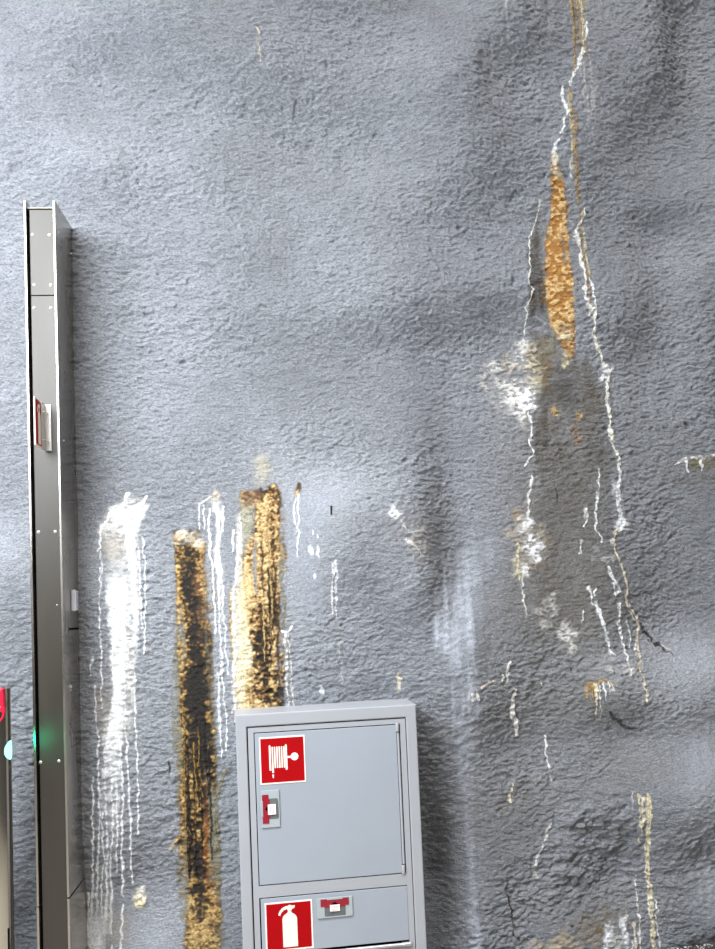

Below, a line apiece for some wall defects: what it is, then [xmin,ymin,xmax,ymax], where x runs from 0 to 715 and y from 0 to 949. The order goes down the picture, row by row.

crack [552,21,588,177]
crack [521,202,541,361]
rust [545,91,592,368]
water stain [87,492,148,949]
rust [170,530,228,949]
water stain [198,492,235,758]
rust [229,483,301,723]
crack [524,410,534,520]
water stain [513,518,546,576]
rust [585,679,614,717]
crack [573,208,671,705]
water stain [604,793,661,949]